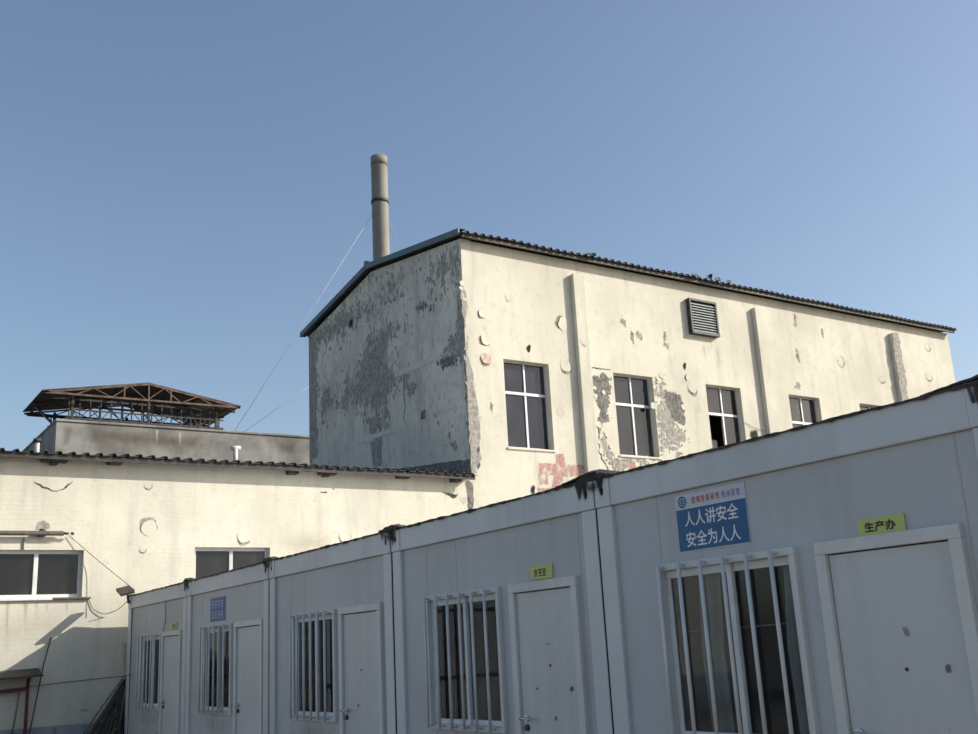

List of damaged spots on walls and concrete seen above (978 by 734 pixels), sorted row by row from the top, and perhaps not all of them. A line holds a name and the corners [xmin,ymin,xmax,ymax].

peeling [309,244,493,509]
peeling [592,363,697,471]
peeling [892,332,909,401]